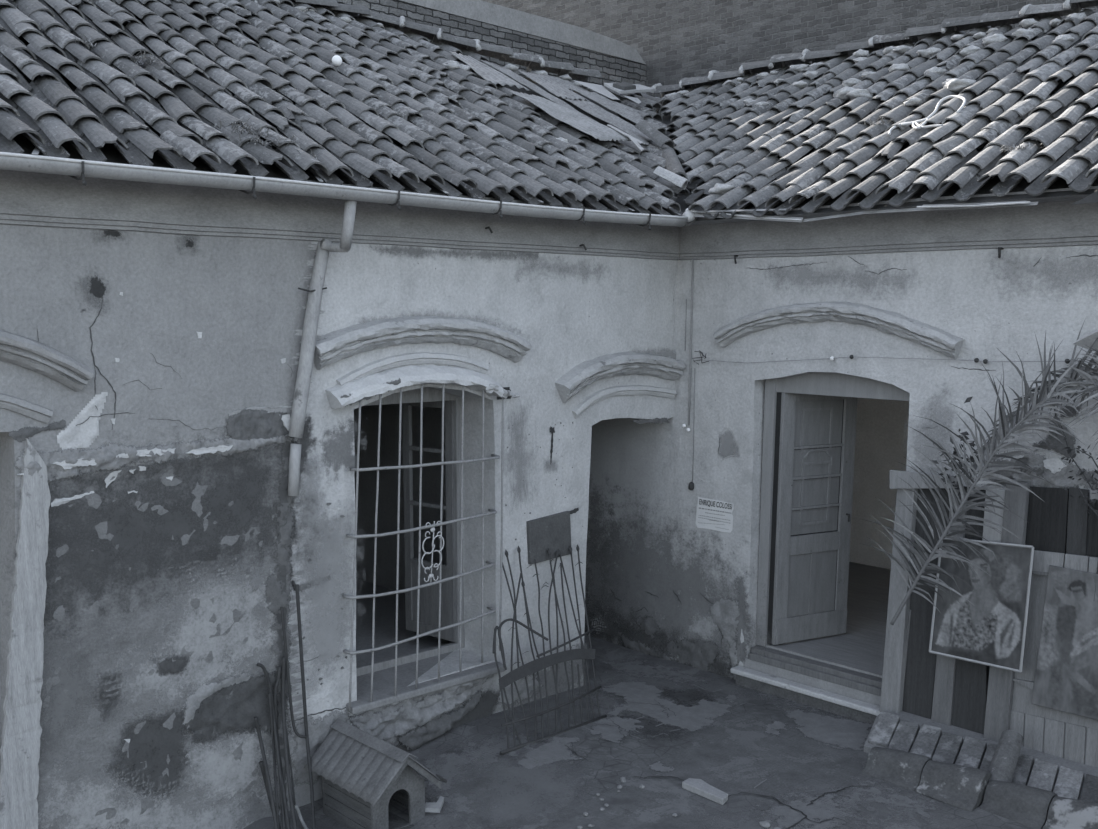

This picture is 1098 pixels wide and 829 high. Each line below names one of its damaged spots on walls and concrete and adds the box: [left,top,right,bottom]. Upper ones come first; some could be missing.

crack [90,299,222,430]
flaking render [9,392,293,829]
leakage [506,491,758,709]
flaking render [290,672,543,786]
crack [728,786,870,829]